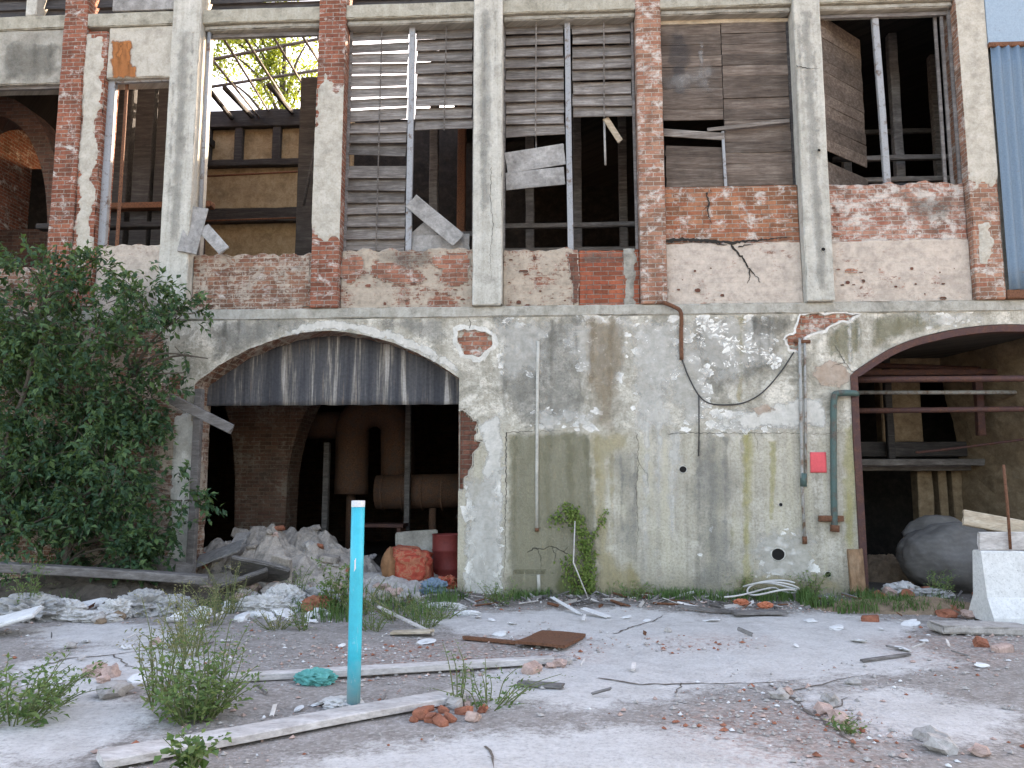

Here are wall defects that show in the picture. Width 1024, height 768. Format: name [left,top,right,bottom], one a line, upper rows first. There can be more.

corrosion [111,40,136,78]
flaking render [73,34,104,267]
flaking render [340,252,470,300]
peeling [282,317,548,378]
peeling [563,248,861,437]
crack [666,192,787,283]
peeling [459,409,505,594]
water stain [509,433,594,595]